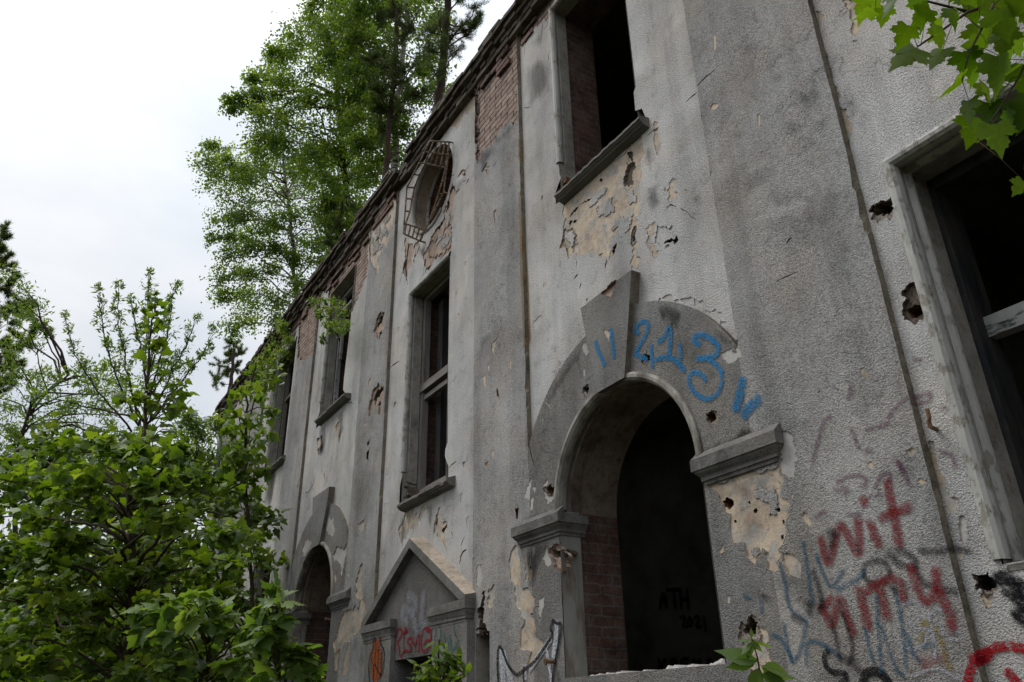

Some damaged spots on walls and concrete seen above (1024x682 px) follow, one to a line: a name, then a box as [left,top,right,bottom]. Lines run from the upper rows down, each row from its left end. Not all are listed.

peeling [297,197,396,361]
peeling [403,169,466,280]
peeling [559,121,678,269]
hole [872,200,894,216]
spalling [901,282,933,325]
spalling [364,378,396,426]
peeling [514,479,554,521]
peeling [709,430,812,578]
peeling [326,515,365,676]
peeling [508,543,578,664]
spalling [976,575,997,610]